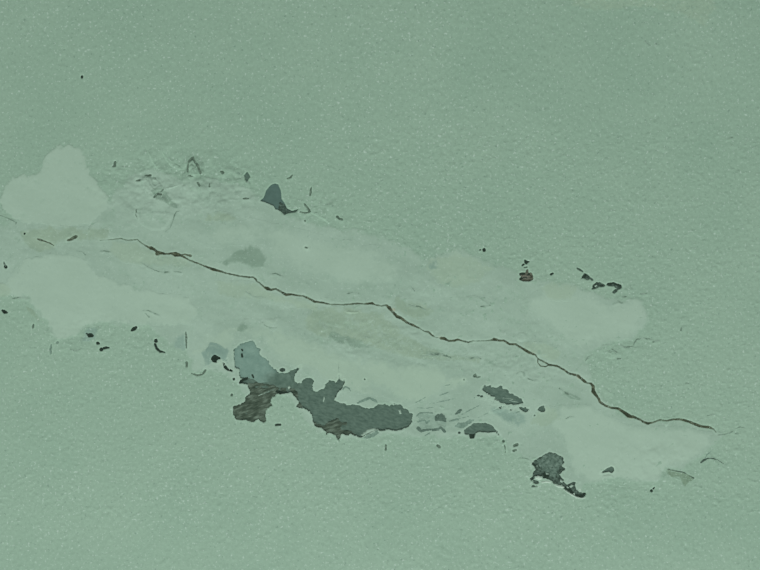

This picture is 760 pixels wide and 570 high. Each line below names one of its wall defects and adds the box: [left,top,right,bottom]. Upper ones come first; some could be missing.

peeling [261,184,298,215]
peeling [577,268,622,293]
crack [37,221,745,435]
peeling [211,341,529,453]
peeling [530,452,586,499]